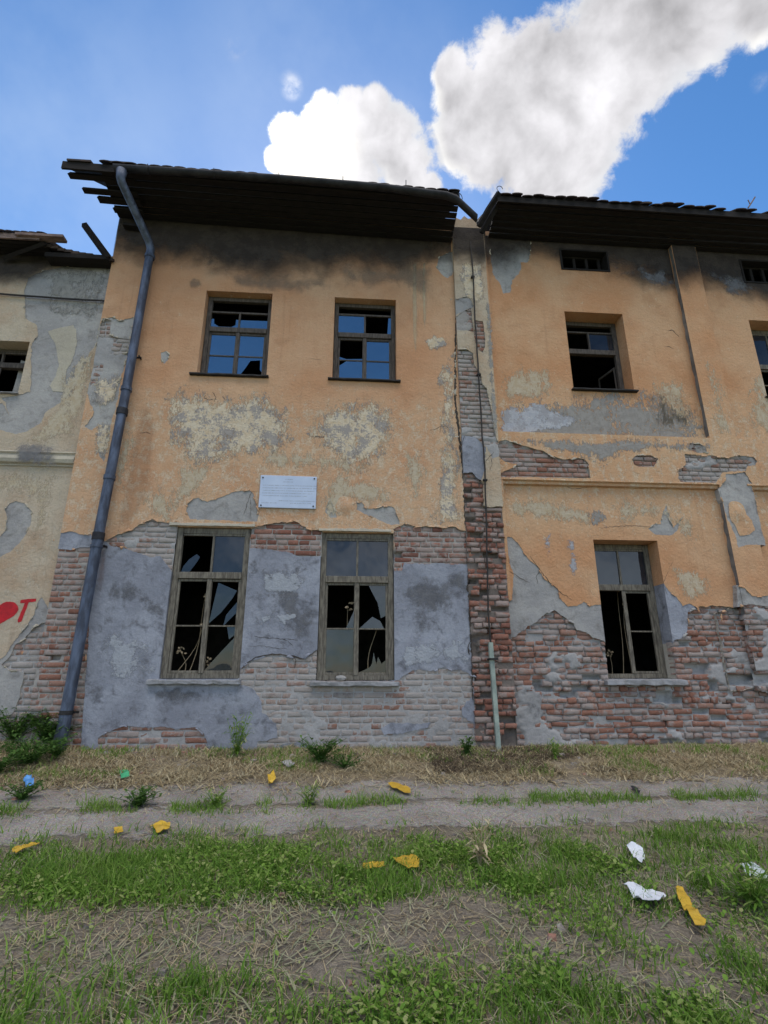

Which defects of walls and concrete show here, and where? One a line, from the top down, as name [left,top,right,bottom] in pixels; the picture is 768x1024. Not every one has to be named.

spalling [43,244,97,255]
peeling [0,258,136,488]
peeling [164,388,294,466]
peeling [0,501,33,557]
flaking render [106,489,324,570]
flaking render [238,234,768,749]
flaking render [98,725,207,750]